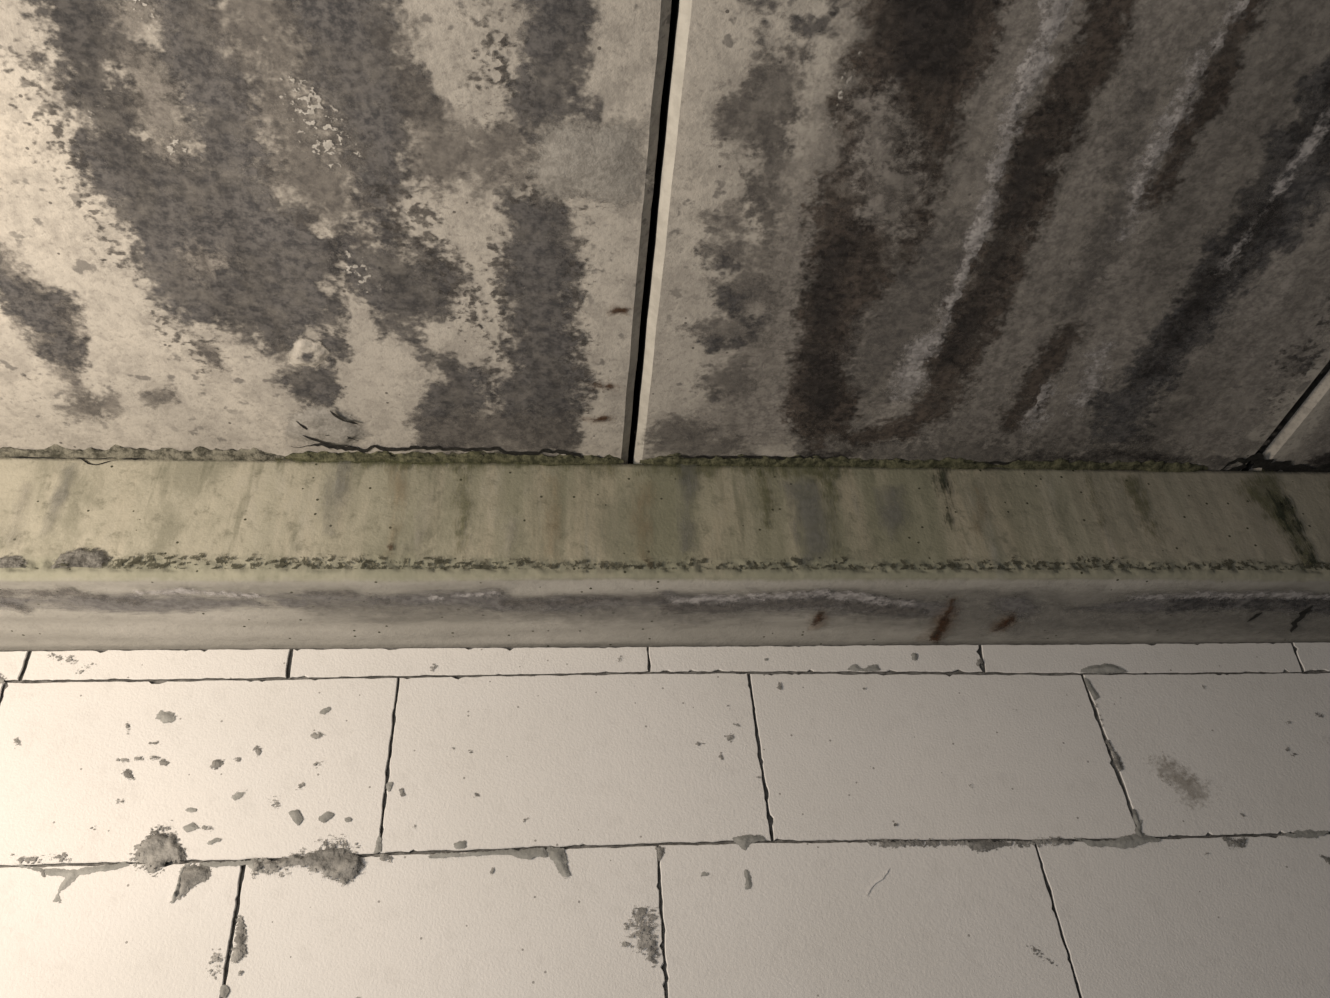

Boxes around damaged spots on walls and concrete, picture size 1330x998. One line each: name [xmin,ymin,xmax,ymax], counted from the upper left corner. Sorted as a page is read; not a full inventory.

damp [0,0,602,456]
damp [644,0,1330,469]
crack [291,443,604,458]
rust [929,599,955,644]
peeling [151,807,221,845]
peeling [268,795,360,850]
peeling [171,859,263,903]